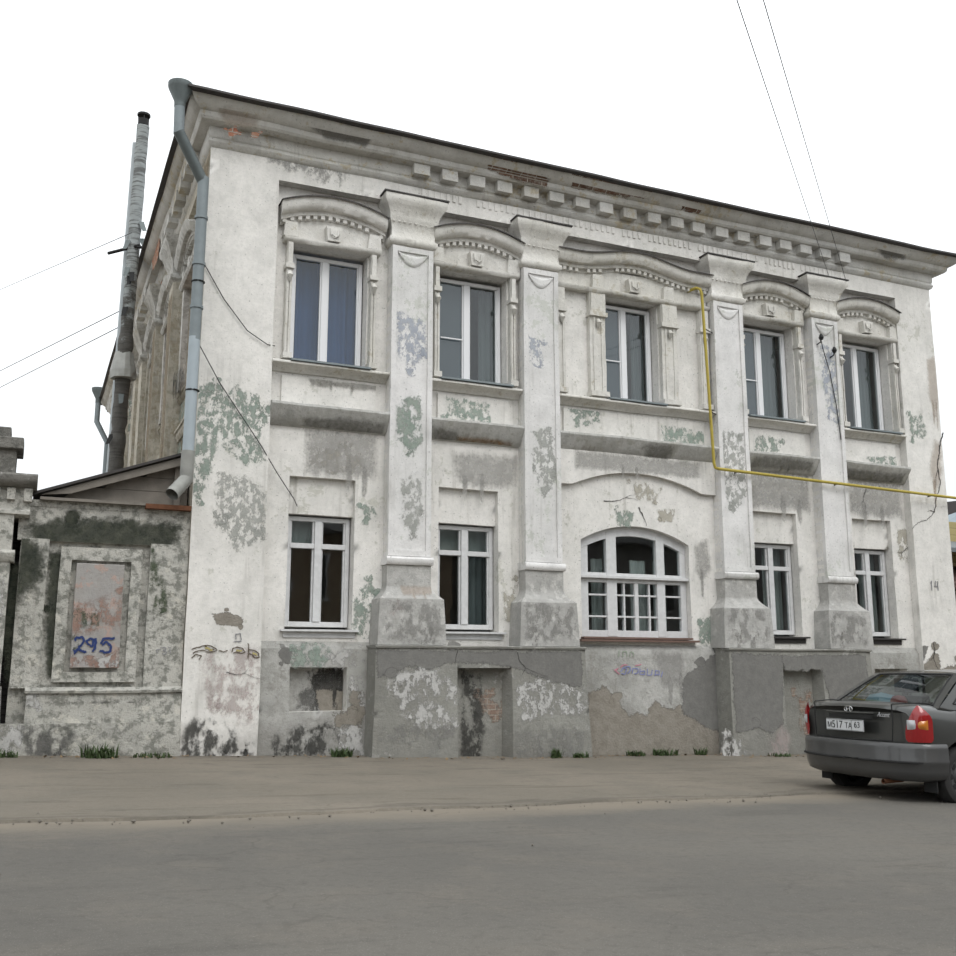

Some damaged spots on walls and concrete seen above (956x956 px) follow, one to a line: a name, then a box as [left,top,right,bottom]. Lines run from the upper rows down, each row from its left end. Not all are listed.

peeling [385,667,459,730]
flaking render [516,617,746,756]